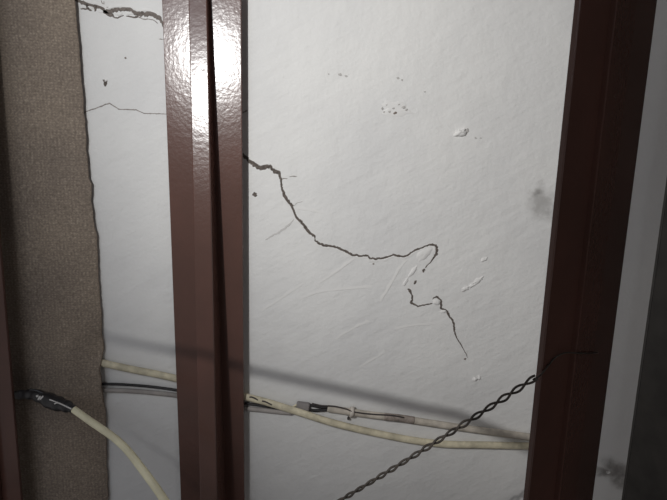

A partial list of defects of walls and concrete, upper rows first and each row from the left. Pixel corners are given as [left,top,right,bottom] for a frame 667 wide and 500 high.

crack [75,0,163,40]
crack [84,103,164,114]
crack [243,153,468,358]